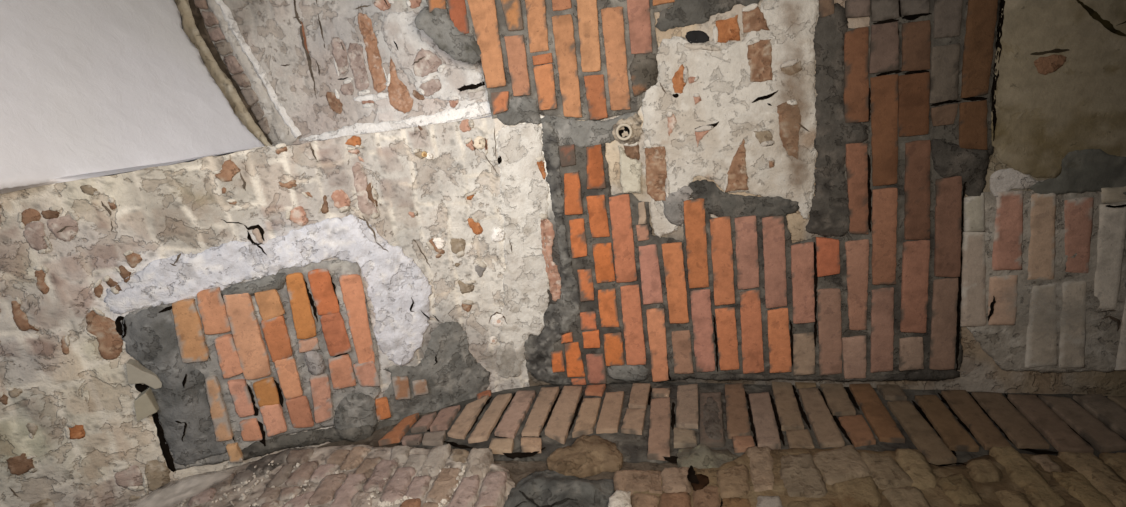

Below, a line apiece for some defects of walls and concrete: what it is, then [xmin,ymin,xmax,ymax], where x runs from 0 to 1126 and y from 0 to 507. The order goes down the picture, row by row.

crack [221,219,267,255]
peeling [86,0,561,378]
peeling [618,0,819,237]
peeling [989,168,1044,197]